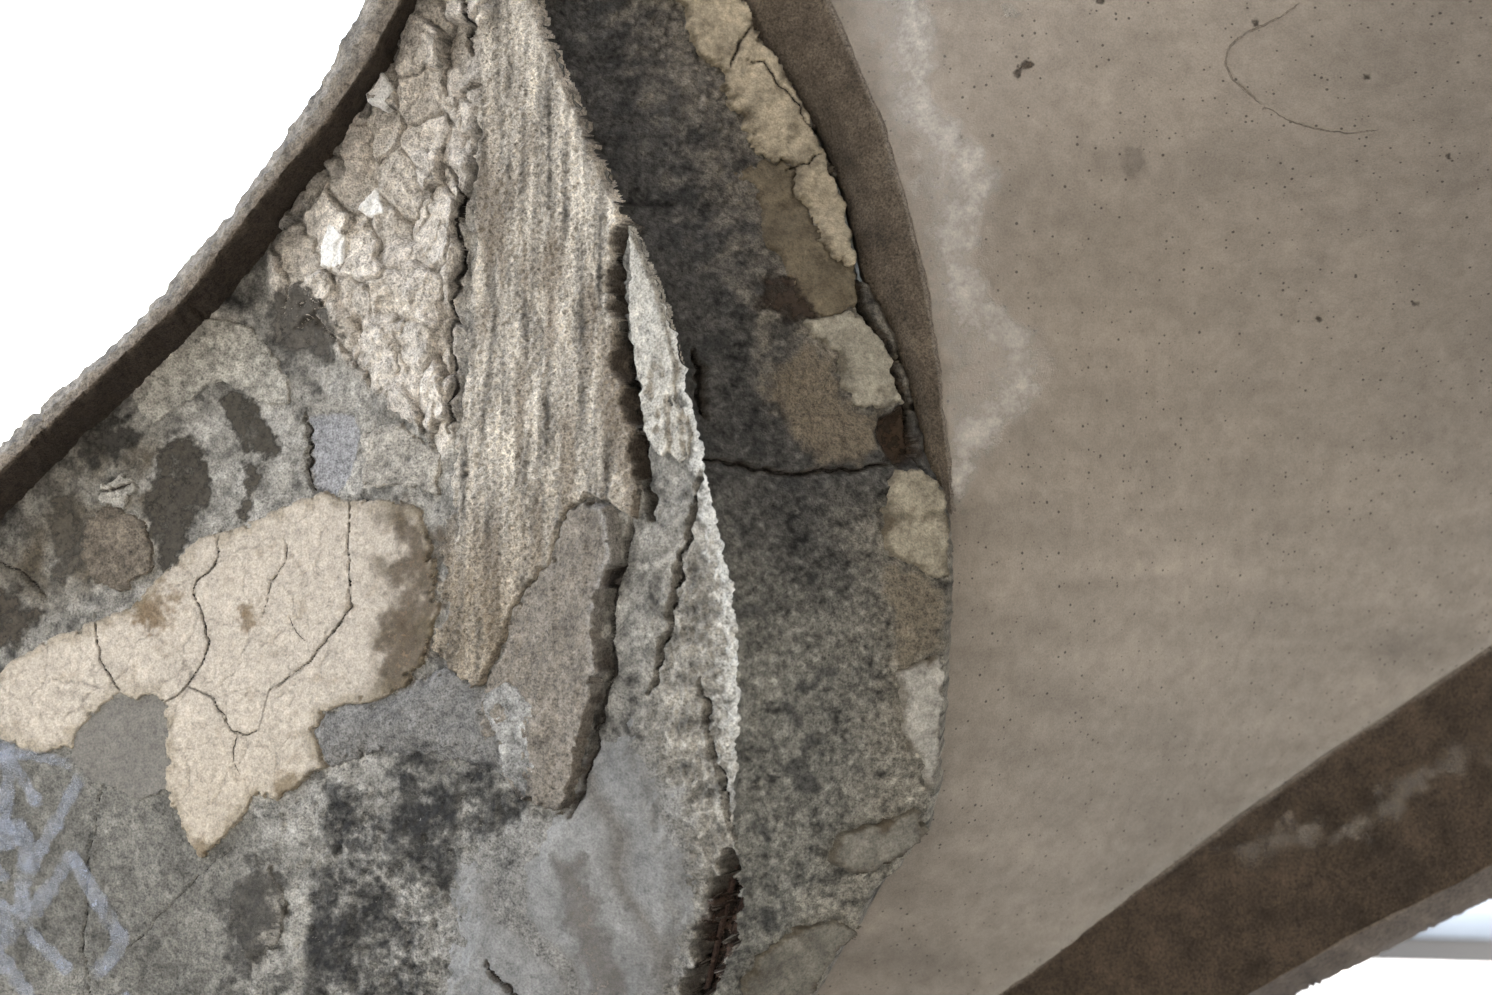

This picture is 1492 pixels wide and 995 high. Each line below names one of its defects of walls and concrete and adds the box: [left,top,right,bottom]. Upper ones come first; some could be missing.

peeling [0,0,693,858]
crack [448,173,470,422]
crack [624,329,650,454]
peeling [675,0,857,268]
crack [656,385,906,672]
spalling [755,275,818,322]
spalling [876,406,922,468]
efflorescence [896,0,1037,494]
crack [177,541,253,772]
crack [583,531,635,795]
peeling [228,864,288,956]
corrosion [694,880,743,995]